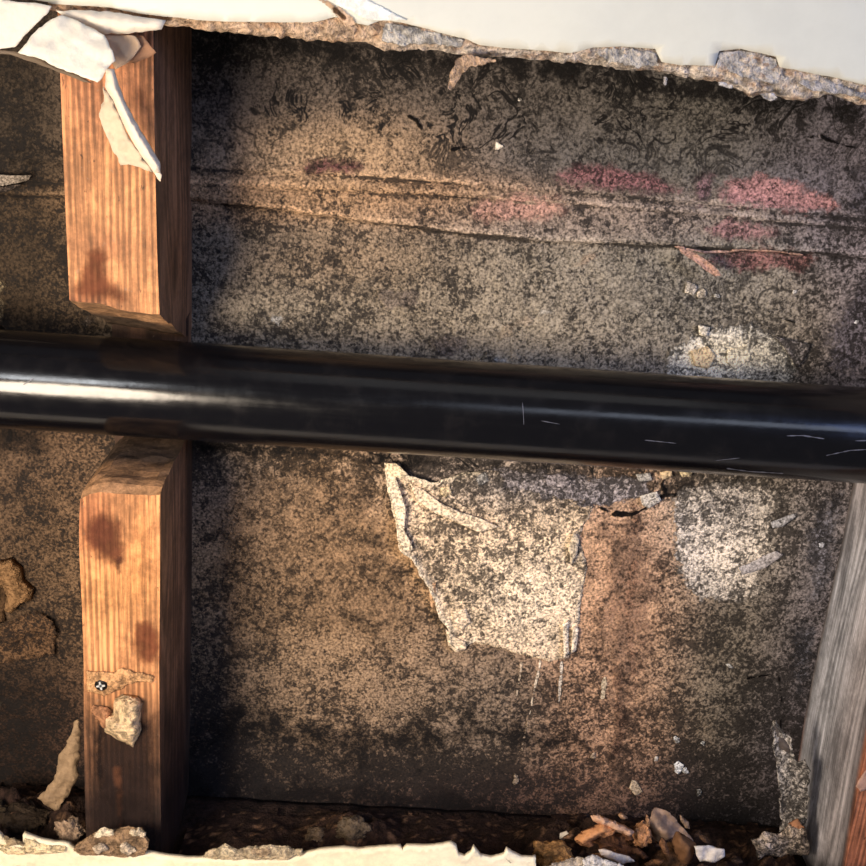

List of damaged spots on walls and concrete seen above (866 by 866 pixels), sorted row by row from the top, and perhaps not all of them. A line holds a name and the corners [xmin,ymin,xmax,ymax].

spalling [0,557,58,663]
water stain [86,516,123,568]
peeling [384,463,796,662]
crack [600,480,677,518]